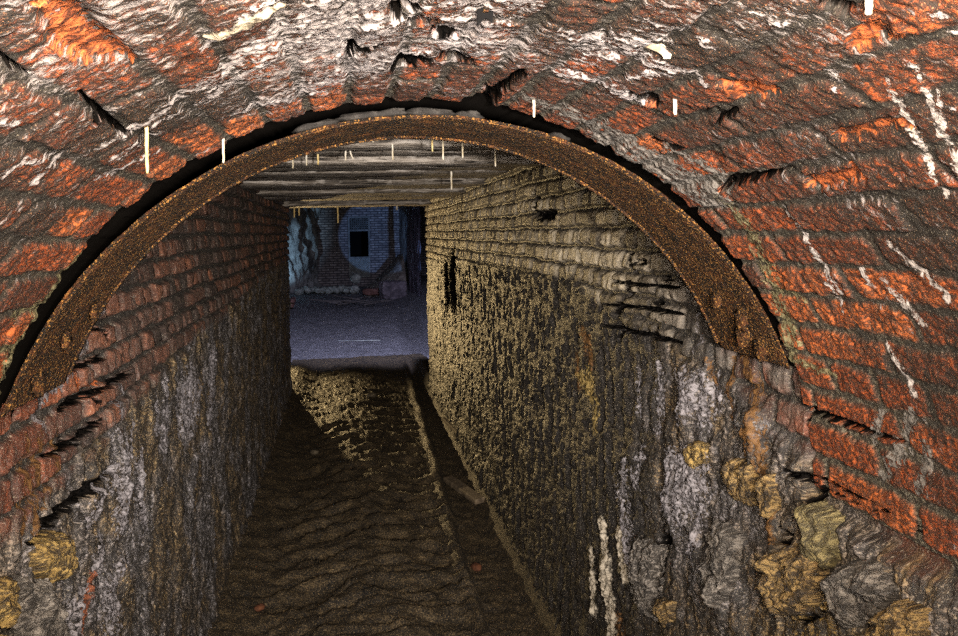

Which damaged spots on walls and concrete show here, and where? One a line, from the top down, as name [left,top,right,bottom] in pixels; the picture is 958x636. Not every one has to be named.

crack [0,36,29,75]
spalling [383,0,475,73]
damp [749,8,791,28]
crack [77,89,144,135]
damp [859,266,927,327]
damp [886,240,951,304]
damp [589,547,598,619]
damp [615,526,630,584]